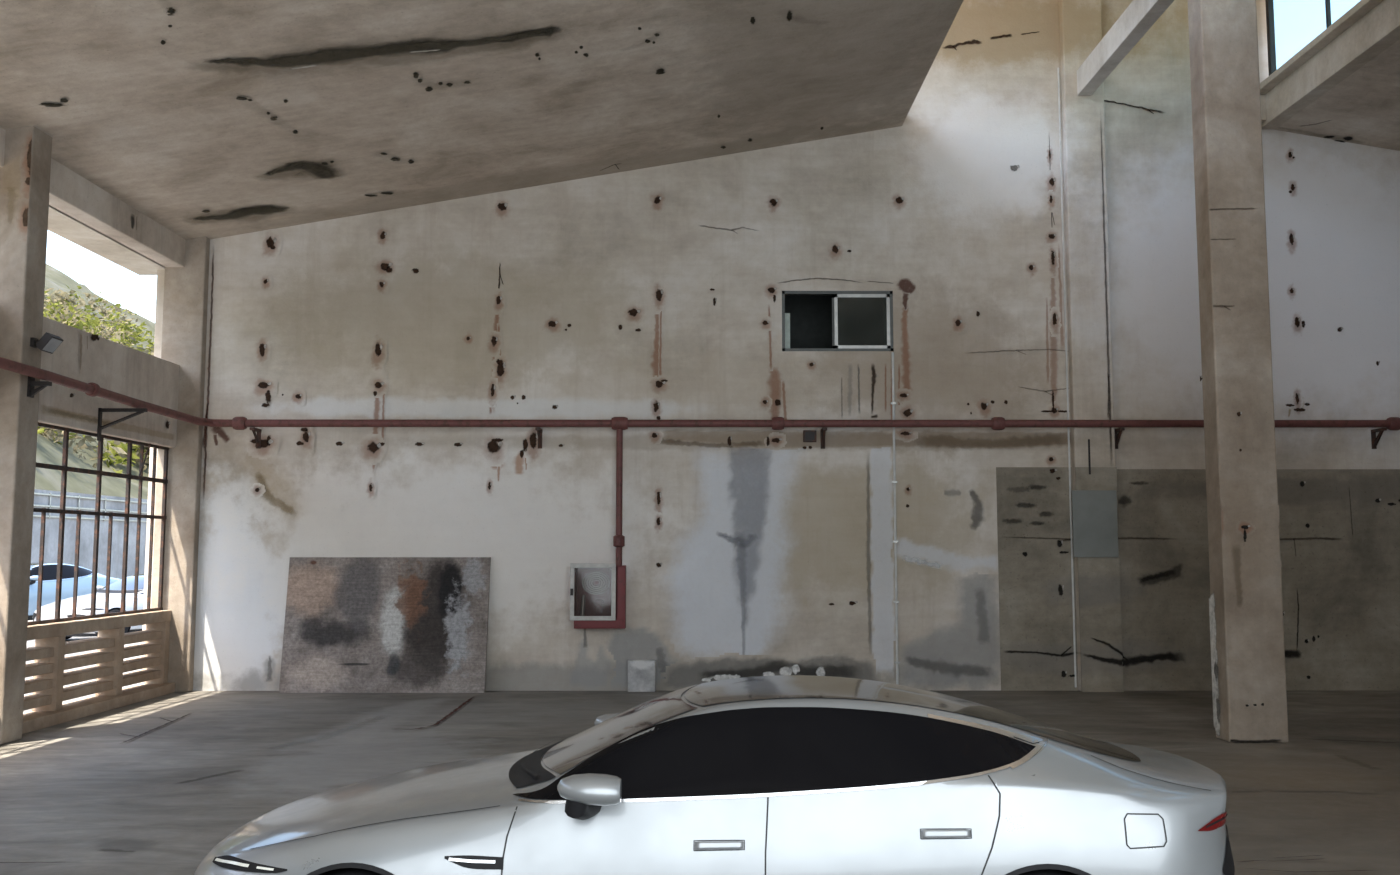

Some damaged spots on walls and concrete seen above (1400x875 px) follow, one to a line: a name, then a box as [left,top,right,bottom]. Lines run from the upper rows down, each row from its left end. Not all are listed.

rust [649,311,663,378]
rust [884,278,918,420]
rust [1045,243,1065,404]
water stain [568,363,1071,691]